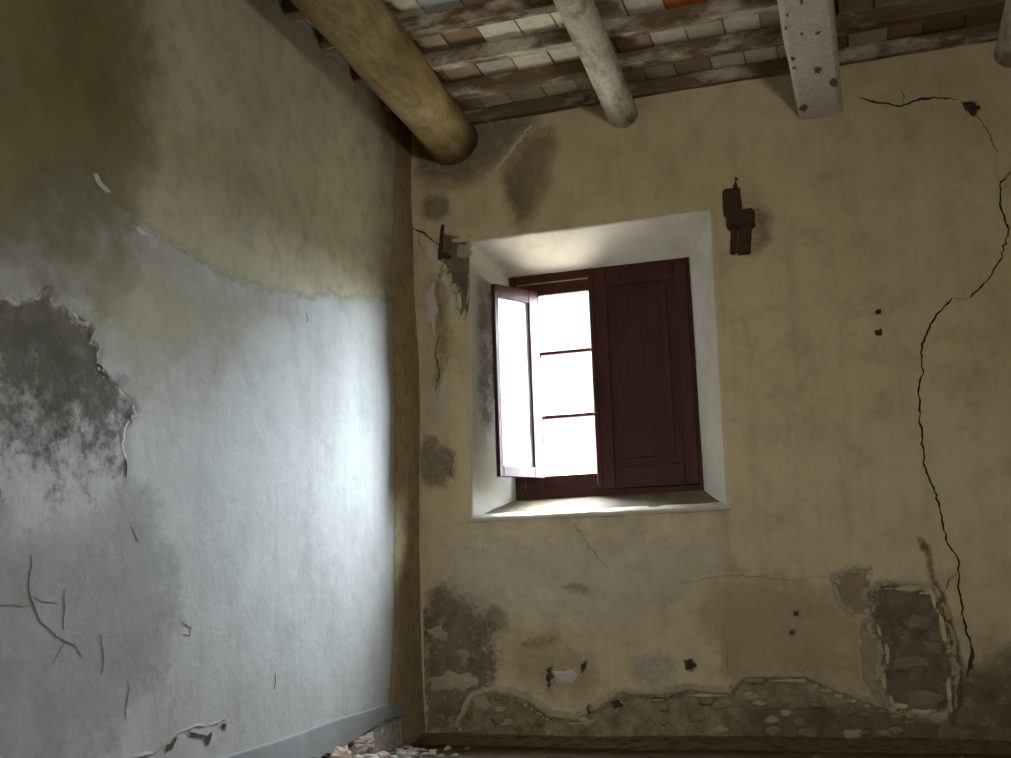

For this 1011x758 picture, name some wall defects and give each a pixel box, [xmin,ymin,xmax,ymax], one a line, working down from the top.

crack [860,89,957,107]
peeling [0,285,138,477]
leakage [0,0,690,744]
crack [918,115,1011,678]
crack [0,555,104,671]
peeling [131,718,227,758]
flaking render [321,718,404,758]
flaking render [452,564,962,740]